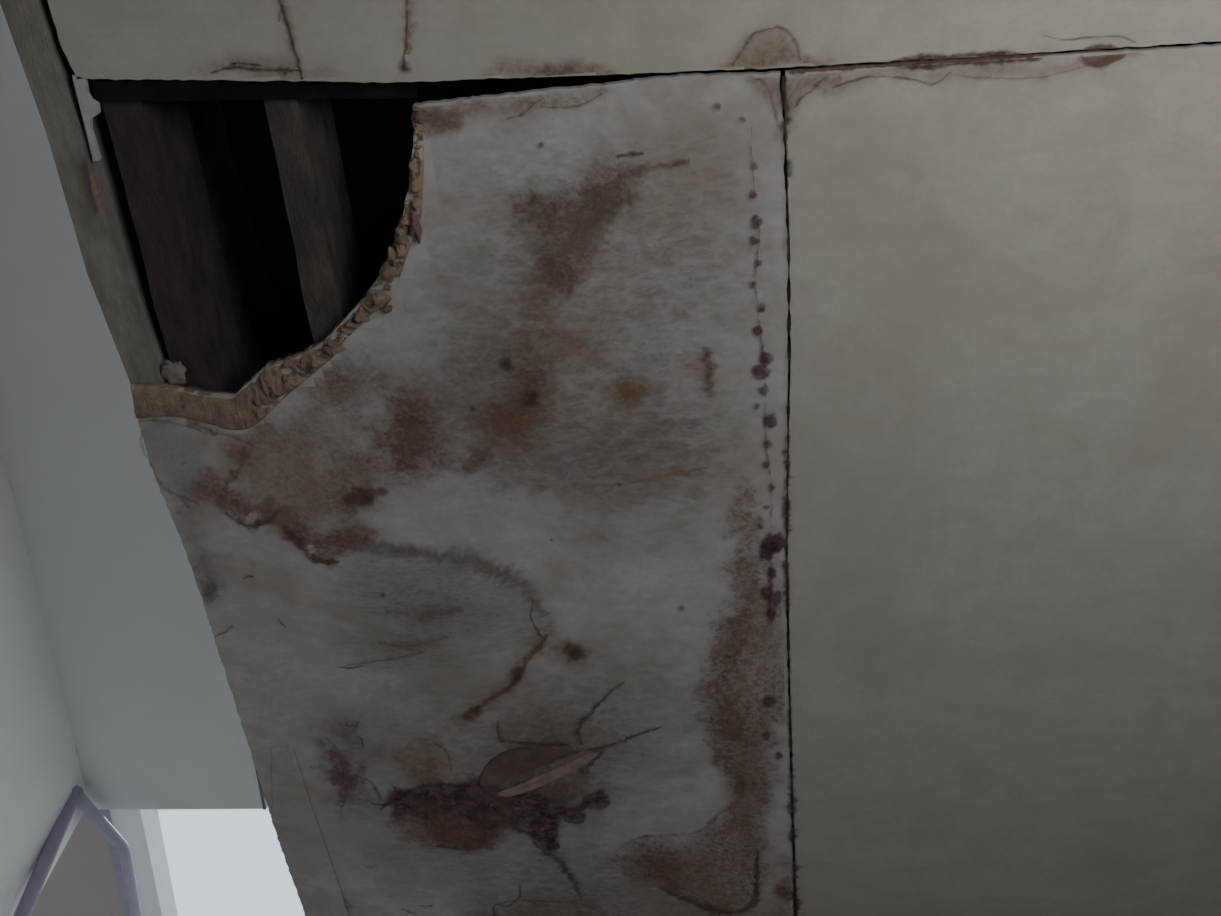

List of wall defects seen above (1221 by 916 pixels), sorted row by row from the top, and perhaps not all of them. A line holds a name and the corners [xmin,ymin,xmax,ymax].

leakage [771,76,801,140]
spalling [133,100,429,430]
leakage [514,152,648,301]
leakage [751,215,777,513]
leakage [759,524,785,622]
crack [463,599,548,720]
peeling [371,681,663,898]